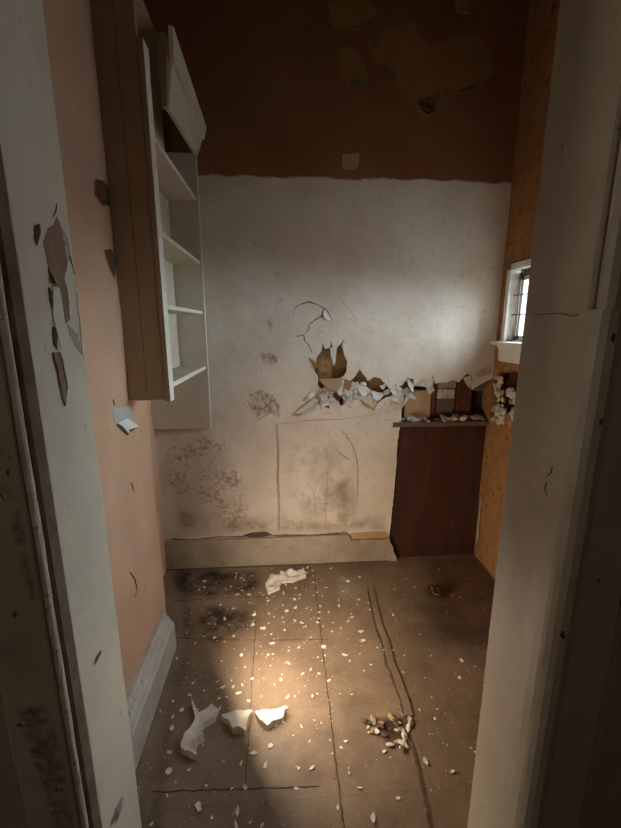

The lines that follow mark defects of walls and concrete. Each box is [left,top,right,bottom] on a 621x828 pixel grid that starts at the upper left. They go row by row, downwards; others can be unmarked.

flaking render [104,249,117,279]
peeling [34,203,83,407]
crack [293,298,357,352]
flaking render [308,343,370,401]
spalling [470,390,483,415]
crack [367,586,433,828]